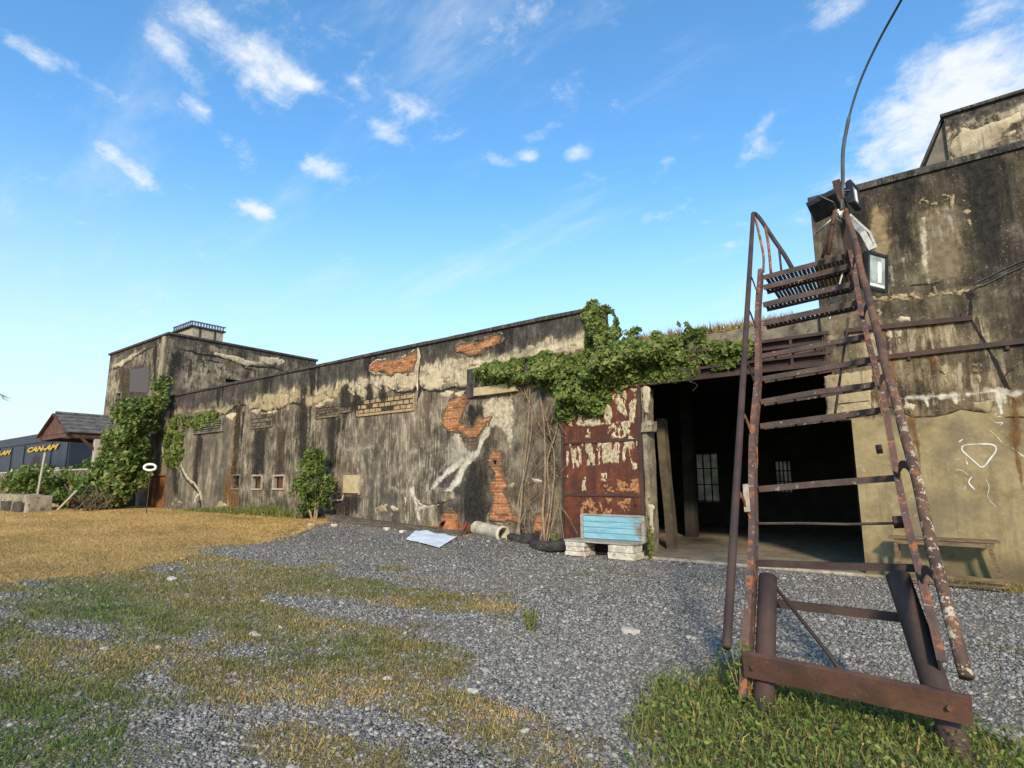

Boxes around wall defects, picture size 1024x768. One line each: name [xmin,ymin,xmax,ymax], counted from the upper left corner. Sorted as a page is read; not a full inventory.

peeling [949,109,1024,158]
damp [838,176,961,283]
damp [172,434,202,496]
damp [231,367,320,482]
damp [328,355,388,467]
flaking render [194,332,585,443]
damp [394,486,434,521]
damp [431,396,514,523]
flaking render [484,447,542,526]
peeling [566,386,657,517]
damp [905,387,1022,414]
corrosion [1009,398,1023,482]